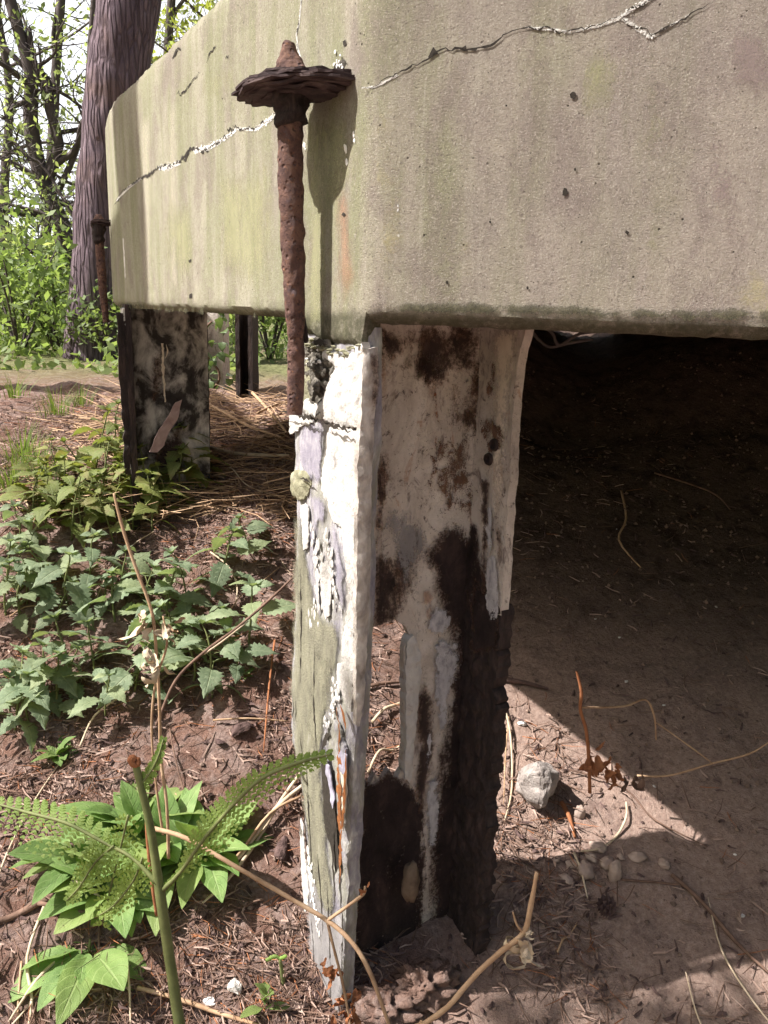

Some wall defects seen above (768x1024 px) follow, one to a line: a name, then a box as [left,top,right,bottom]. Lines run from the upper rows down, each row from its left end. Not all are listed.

crack [361,0,713,89]
crack [114,113,275,205]
peeling [289,415,313,434]
peeling [300,423,357,830]